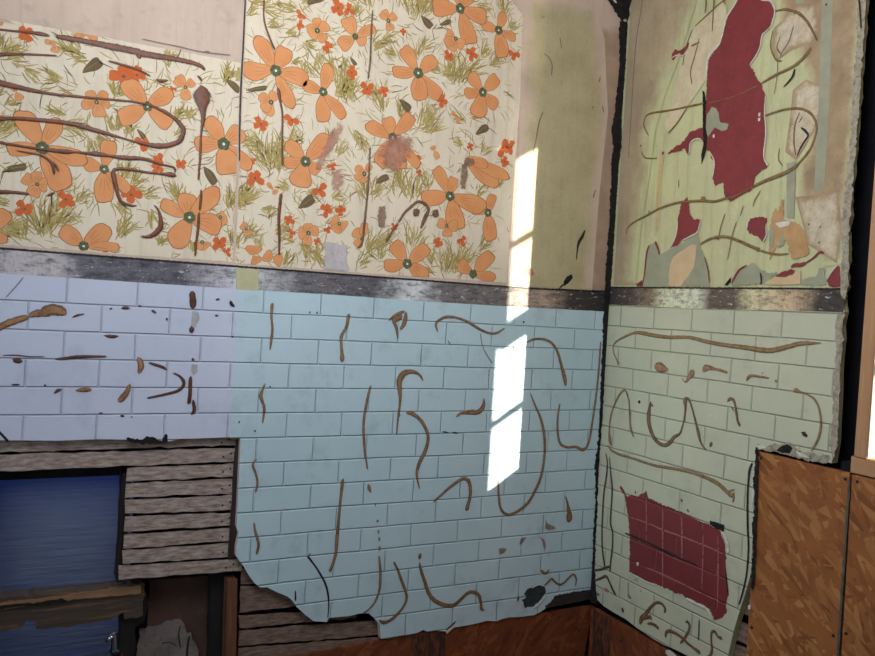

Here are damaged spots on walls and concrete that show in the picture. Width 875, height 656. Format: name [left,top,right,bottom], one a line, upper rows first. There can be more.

peeling [608,0,866,299]
flaking render [127,434,168,445]
flaking render [750,314,845,590]
crack [307,554,329,617]
flaking render [517,584,591,612]
peeling [620,486,730,620]
crack [739,463,753,604]